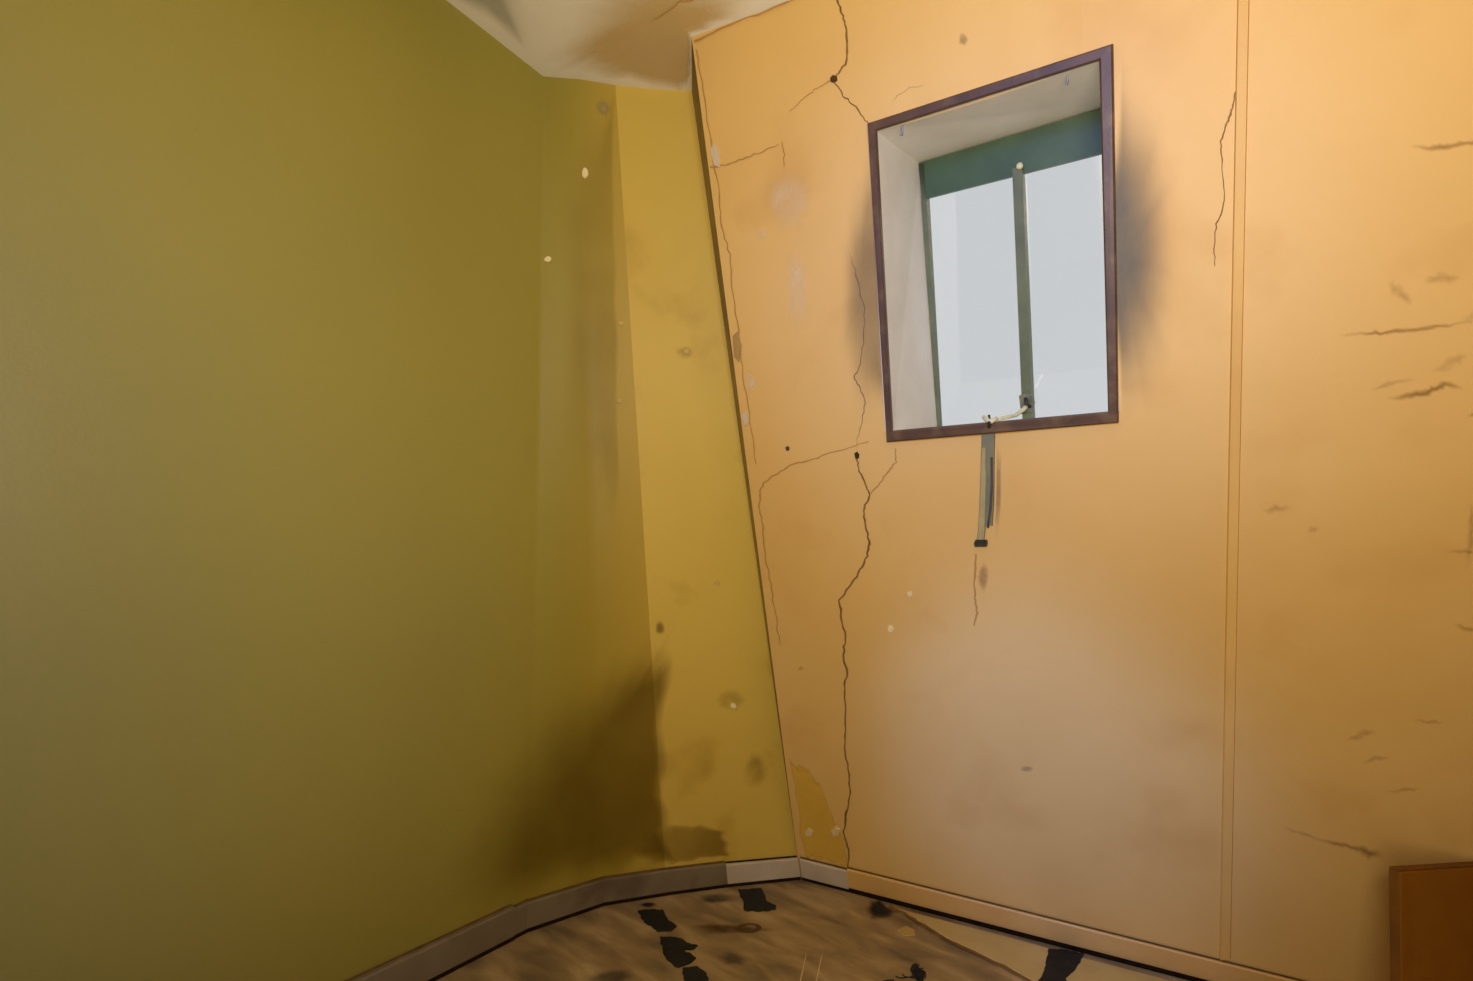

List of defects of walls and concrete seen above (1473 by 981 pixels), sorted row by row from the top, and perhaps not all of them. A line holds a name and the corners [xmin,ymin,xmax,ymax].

damp [595,0,712,82]
crack [1213,91,1236,265]
crack [694,0,897,867]
peeling [791,763,847,866]